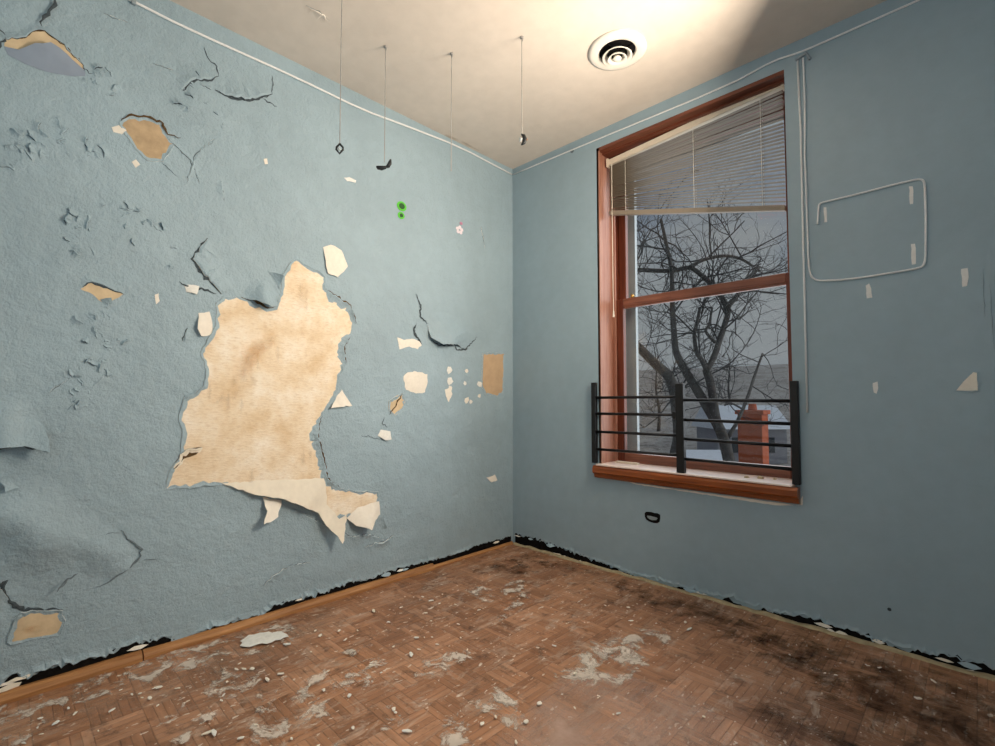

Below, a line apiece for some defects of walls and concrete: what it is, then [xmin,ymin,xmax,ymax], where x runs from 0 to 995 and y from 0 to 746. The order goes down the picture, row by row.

peeling [0,0,93,77]
crack [160,48,275,107]
peeling [112,113,178,174]
peeling [77,272,127,305]
flaking render [165,245,380,544]
peeling [445,352,506,404]
crack [0,580,63,645]
flaking render [0,530,995,692]
damp [920,685,982,746]